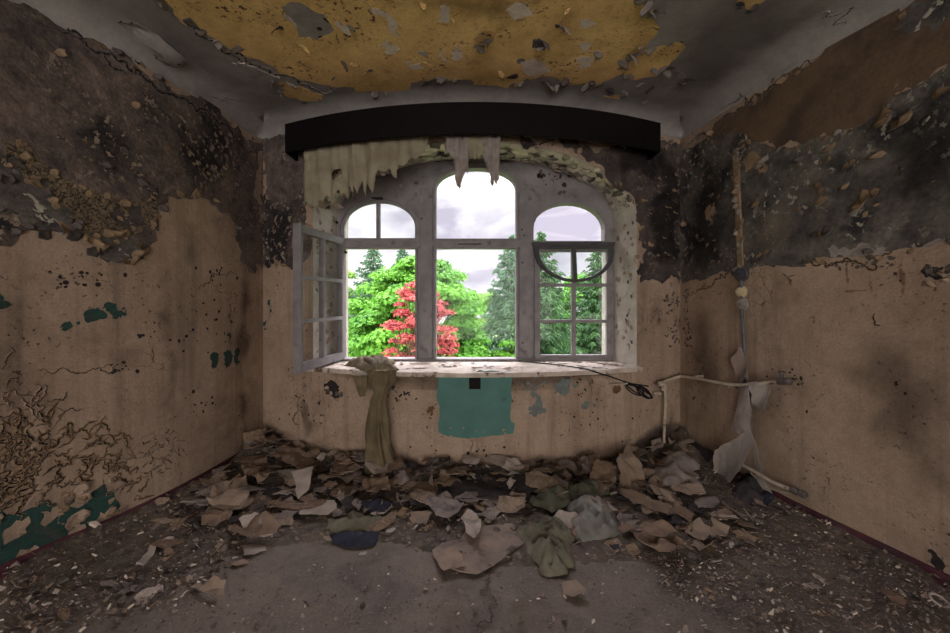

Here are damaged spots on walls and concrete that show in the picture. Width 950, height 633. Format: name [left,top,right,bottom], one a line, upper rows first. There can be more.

peeling [153,0,695,103]
peeling [0,0,363,277]
peeling [406,142,453,165]
peeling [500,0,950,351]
peeling [48,271,103,288]
peeling [202,298,240,369]
crack [0,345,185,521]
peeling [0,476,128,565]